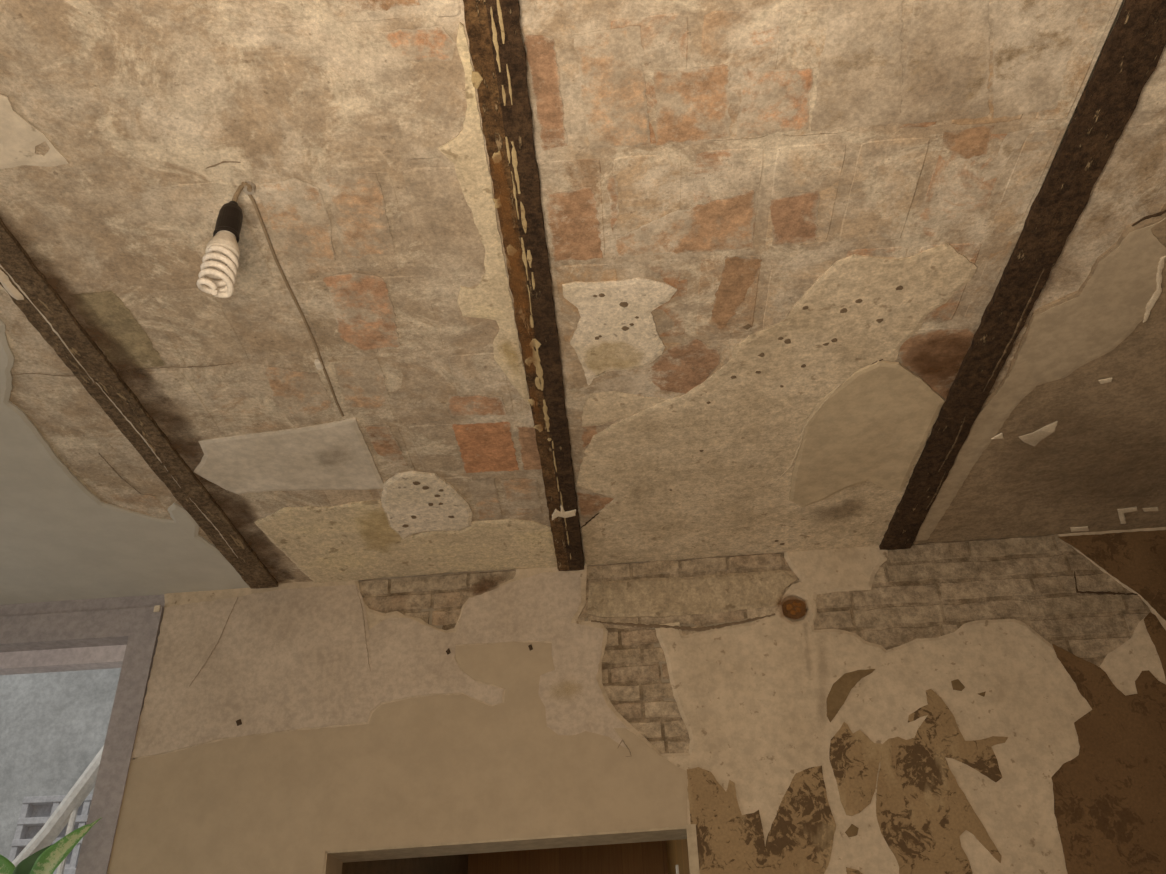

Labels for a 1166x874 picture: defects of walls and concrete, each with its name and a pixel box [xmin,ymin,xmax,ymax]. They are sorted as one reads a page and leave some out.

flaking render [0,0,688,874]
flaking render [519,0,1166,754]
peeling [845,824,859,837]